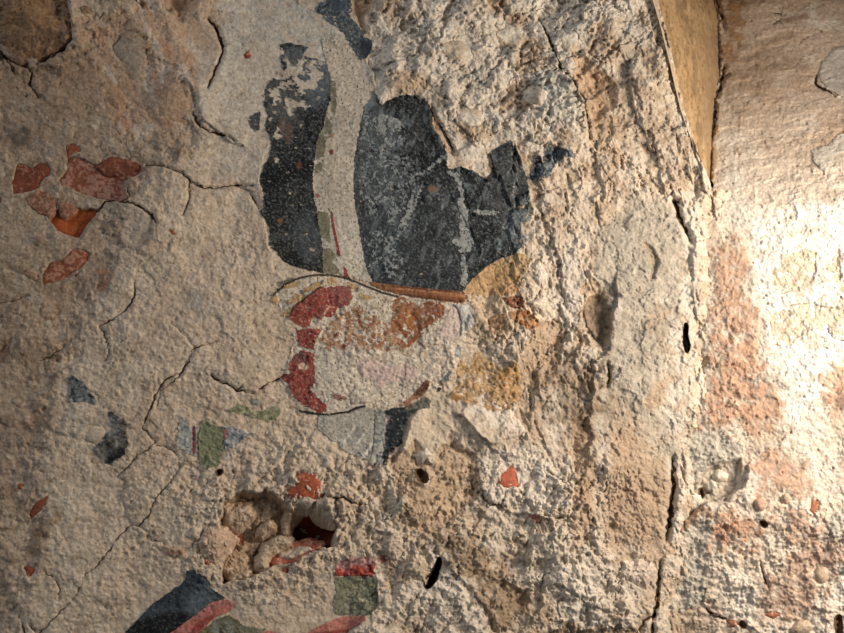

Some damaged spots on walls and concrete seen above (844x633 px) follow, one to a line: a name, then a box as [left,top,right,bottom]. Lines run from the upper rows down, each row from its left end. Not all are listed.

crack [0,50,39,98]
crack [208,19,225,87]
flaking render [352,0,654,177]
crack [539,19,590,137]
crack [193,115,235,142]
crack [99,189,157,224]
crack [146,164,257,209]
crack [665,459,677,537]
flaking render [220,489,331,584]
crack [638,563,661,633]